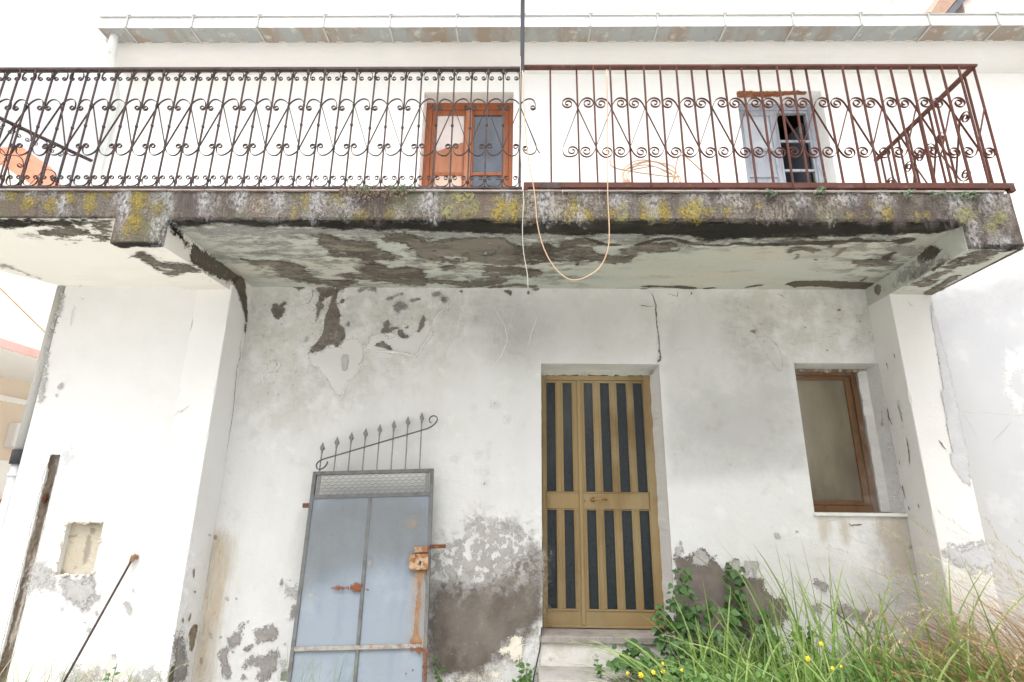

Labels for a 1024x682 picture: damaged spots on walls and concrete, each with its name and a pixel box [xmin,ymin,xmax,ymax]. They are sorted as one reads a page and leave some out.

leakage [0,197,112,245]
leakage [153,190,992,275]
spalling [112,218,1024,487]
crack [641,292,661,363]
peeling [941,538,997,574]
peeling [279,579,298,618]
leakage [428,517,545,676]
peeling [168,614,288,682]